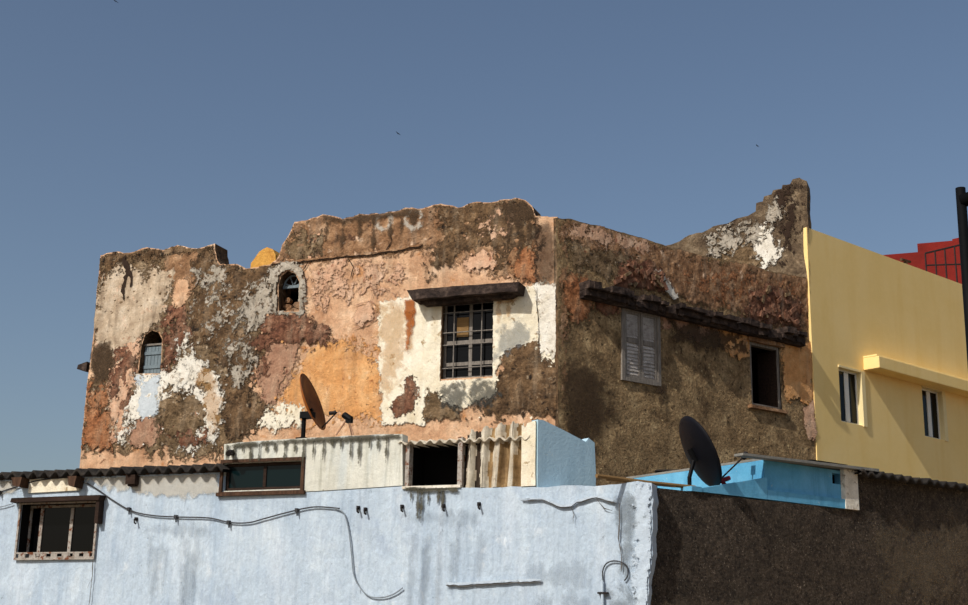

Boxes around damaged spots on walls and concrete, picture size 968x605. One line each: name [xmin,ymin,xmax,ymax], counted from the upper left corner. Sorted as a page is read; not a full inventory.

flaking render [81,198,678,498]
flaking render [703,184,818,442]